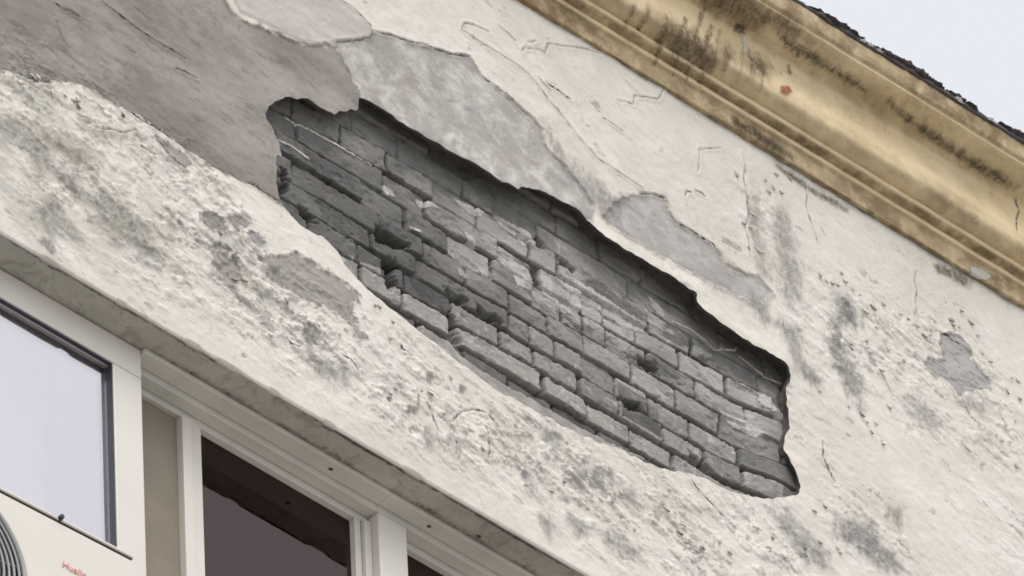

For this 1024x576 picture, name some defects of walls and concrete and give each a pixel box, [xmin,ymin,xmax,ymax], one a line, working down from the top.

leakage [654,0,859,88]
crack [338,1,719,246]
leakage [736,119,847,210]
leakage [893,106,1011,185]
spalling [0,0,800,499]
peeling [899,309,993,395]